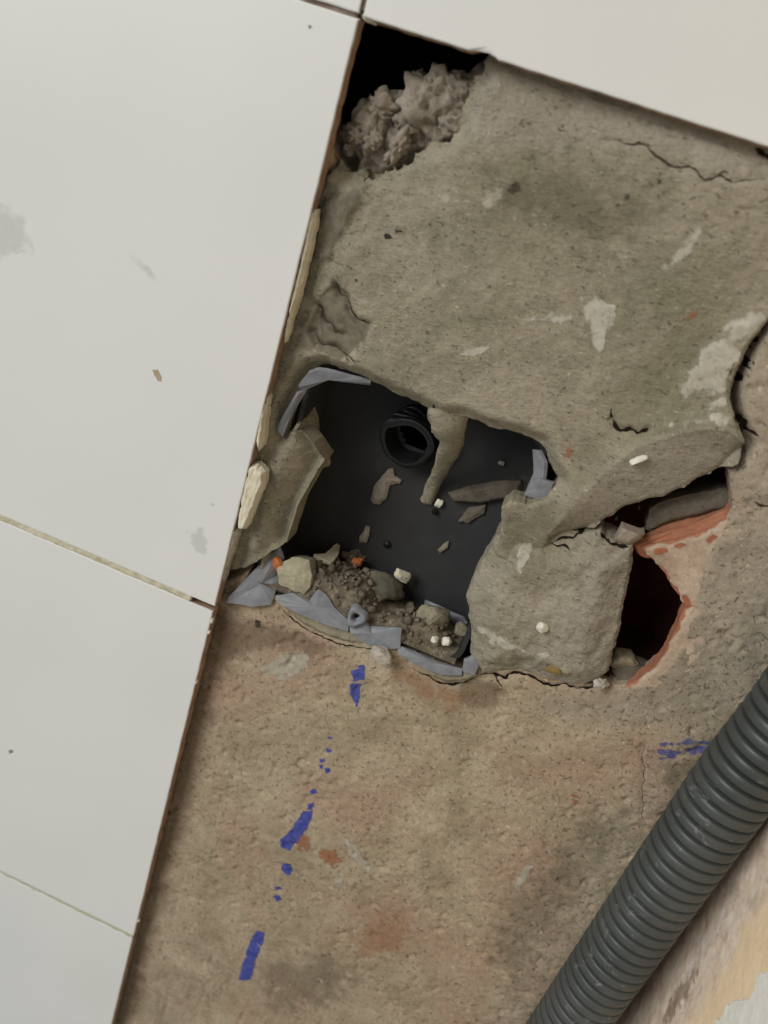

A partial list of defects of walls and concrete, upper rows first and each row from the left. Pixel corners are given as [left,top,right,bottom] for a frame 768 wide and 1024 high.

crack [612,139,768,183]
crack [610,409,648,434]
peeling [629,455,648,465]
peeling [394,568,411,583]
peeling [536,622,549,633]
crack [415,670,593,689]